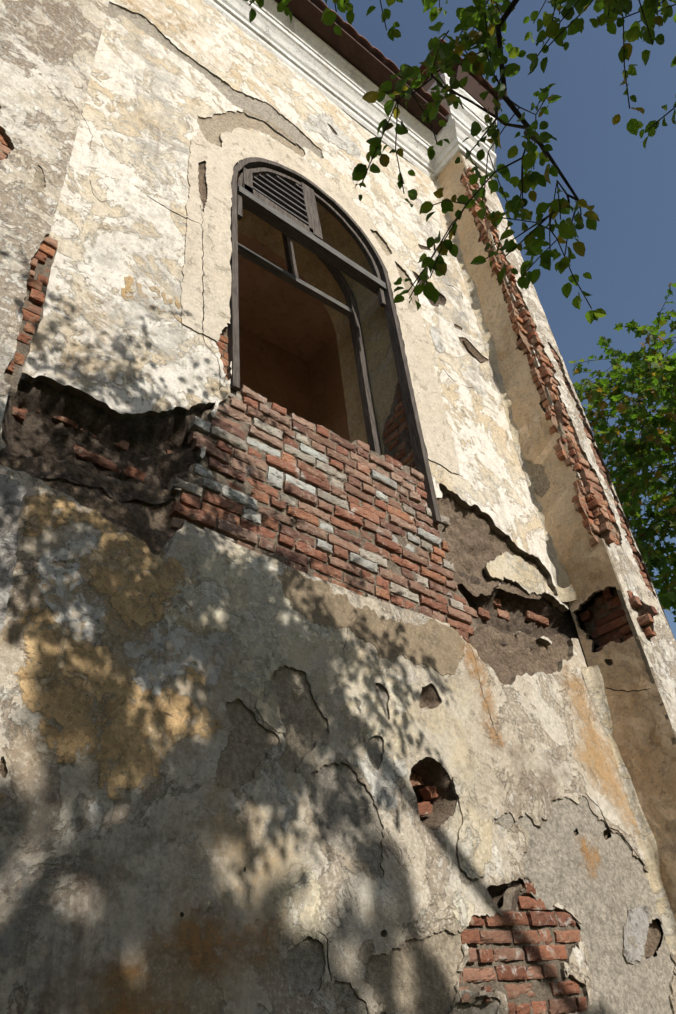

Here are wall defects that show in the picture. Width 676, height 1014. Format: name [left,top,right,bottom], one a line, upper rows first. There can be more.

spalling [0,236,676,1014]